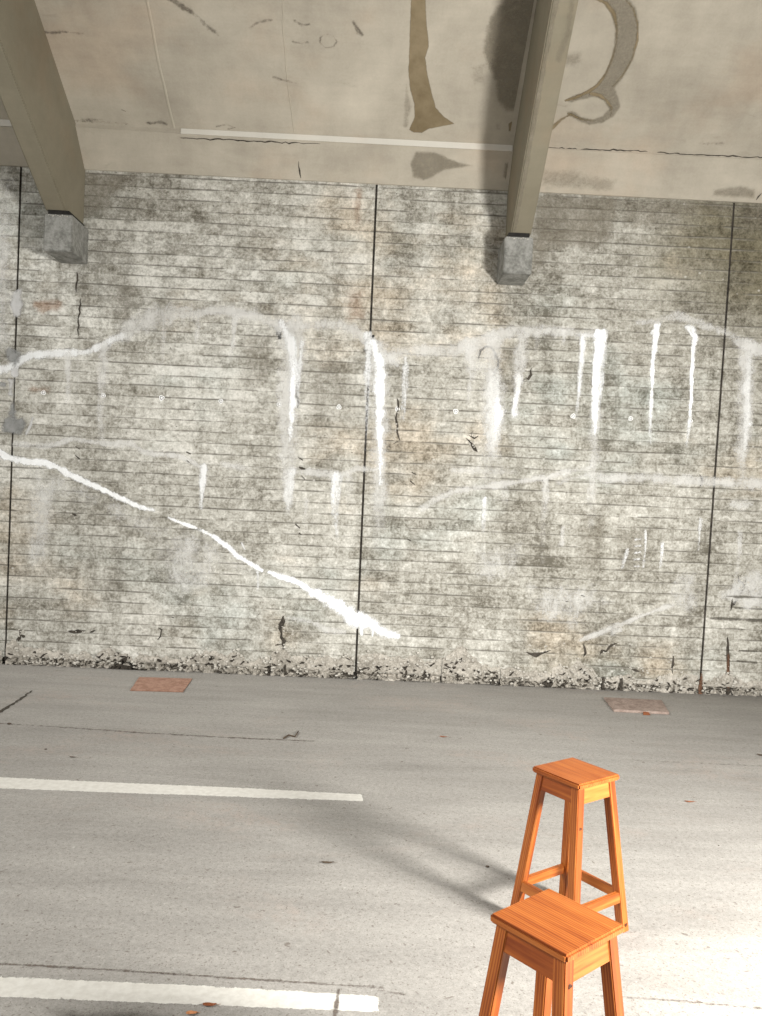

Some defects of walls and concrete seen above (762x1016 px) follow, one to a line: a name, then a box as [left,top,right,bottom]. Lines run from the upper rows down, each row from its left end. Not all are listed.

water stain [409,0,453,133]
water stain [485,0,534,109]
water stain [552,0,639,130]
water stain [412,153,465,179]
water stain [0,306,608,534]
water stain [584,456,762,497]
water stain [637,313,762,457]
crack [275,611,296,652]